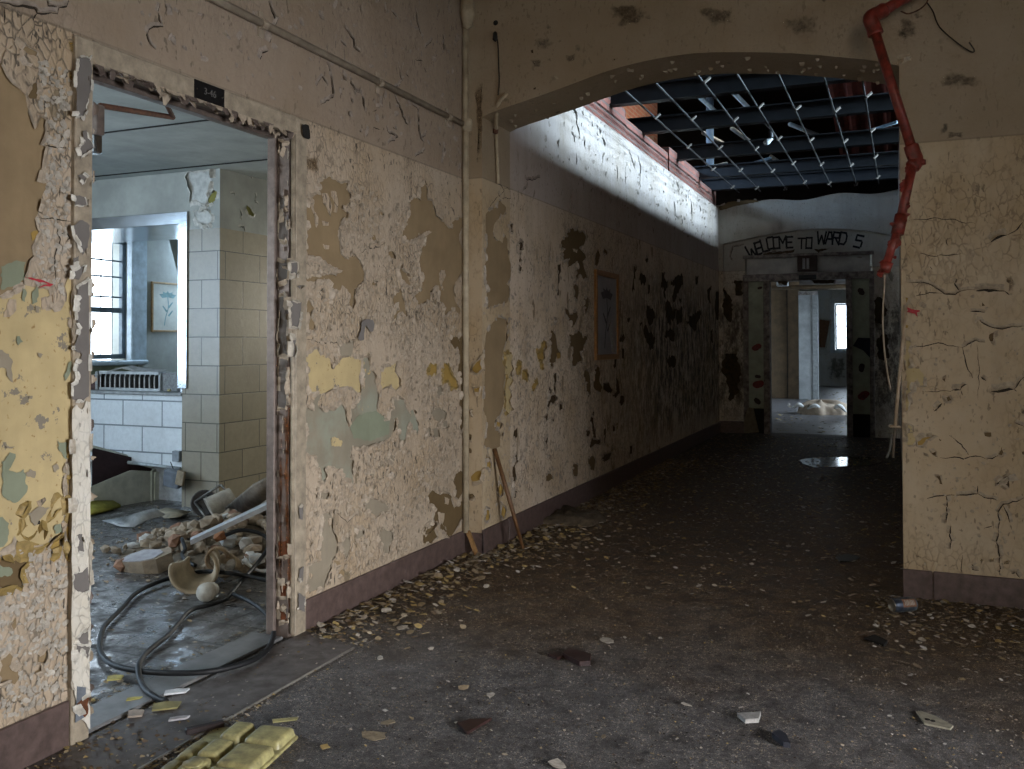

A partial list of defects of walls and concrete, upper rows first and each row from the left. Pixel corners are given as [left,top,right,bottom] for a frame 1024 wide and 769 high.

crack [315,2,427,143]
peeling [627,255,743,368]
crack [907,217,1024,411]
peeling [0,45,625,729]
crack [940,437,998,460]
crack [927,486,1023,578]